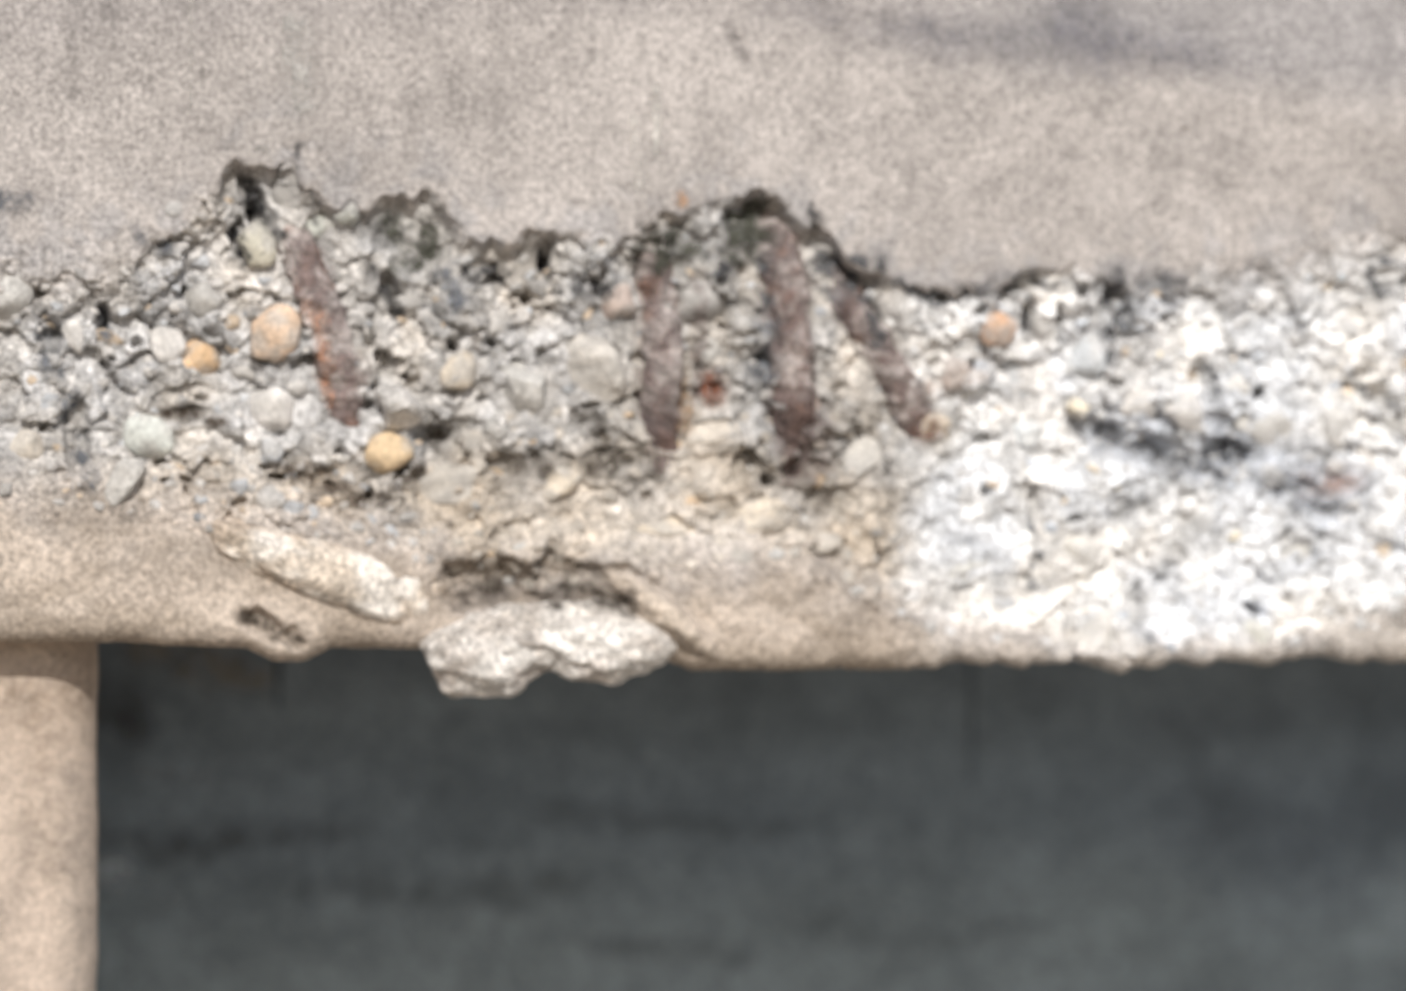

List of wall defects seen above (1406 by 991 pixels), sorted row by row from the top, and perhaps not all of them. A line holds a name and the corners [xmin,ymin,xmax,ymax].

corrosion [276,225,365,427]
spalling [0,161,921,625]
corrosion [634,243,723,471]
corrosion [755,210,937,477]